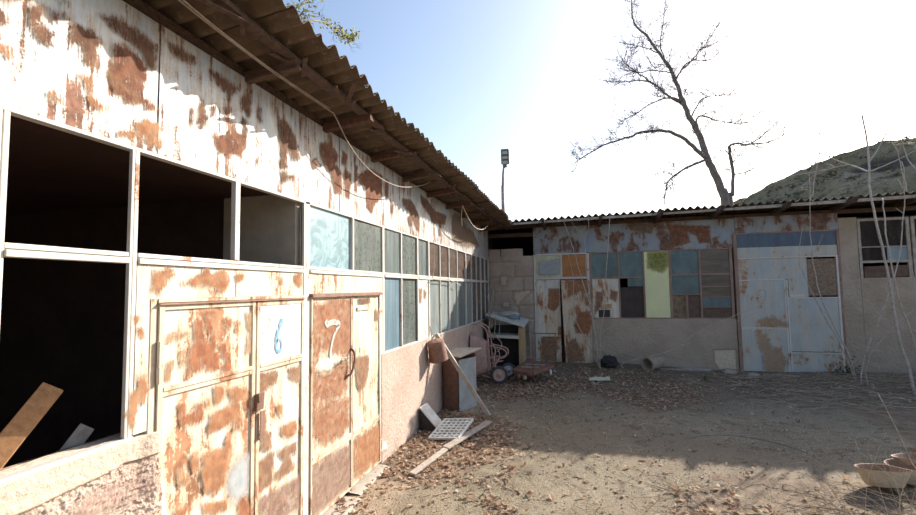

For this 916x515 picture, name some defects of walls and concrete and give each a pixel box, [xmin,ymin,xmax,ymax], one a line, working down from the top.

rust [0,0,109,115]
rust [100,13,196,149]
rust [188,100,217,129]
rust [209,69,263,156]
rust [278,116,301,182]
rust [313,142,478,247]
rust [666,224,711,248]
rust [164,309,252,381]
rust [540,280,617,363]
rust [126,374,150,428]
rust [177,370,300,515]
rust [290,298,382,515]